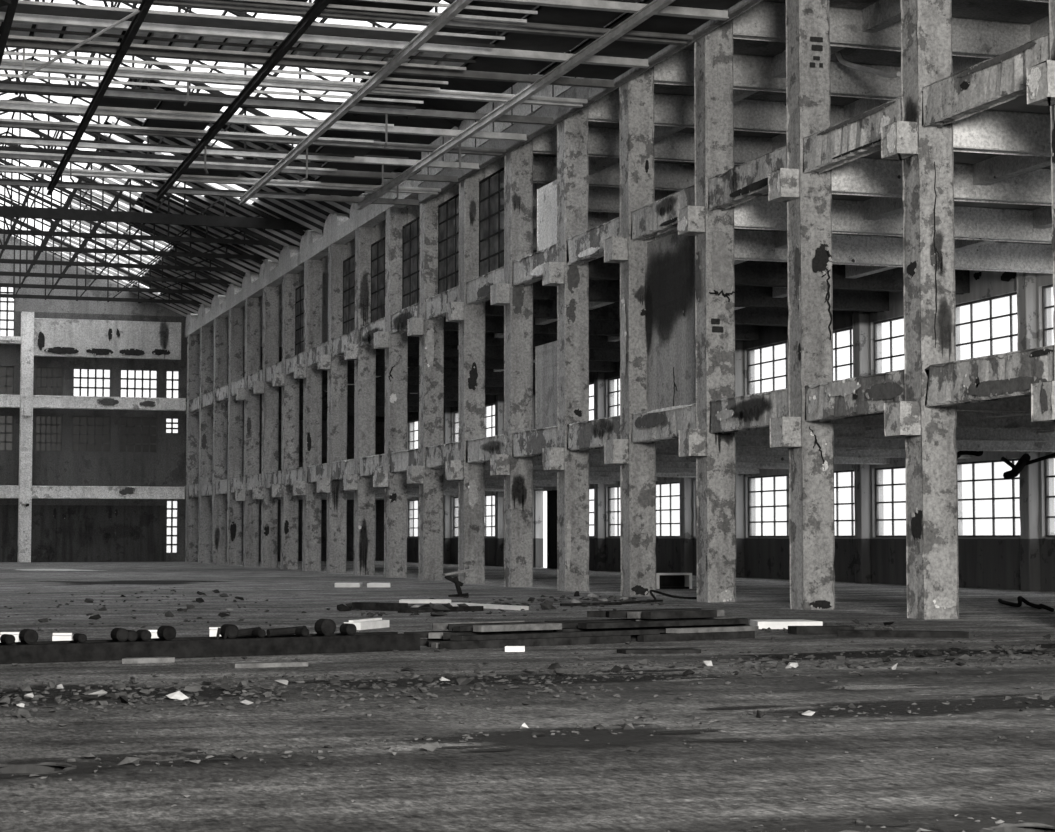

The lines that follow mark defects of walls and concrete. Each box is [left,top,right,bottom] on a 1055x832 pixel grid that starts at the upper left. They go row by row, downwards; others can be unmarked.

spalling [794,243,832,317]
spalling [468,362,478,390]
peeling [715,409,734,421]
peeling [808,380,903,415]
peeling [963,374,1048,414]